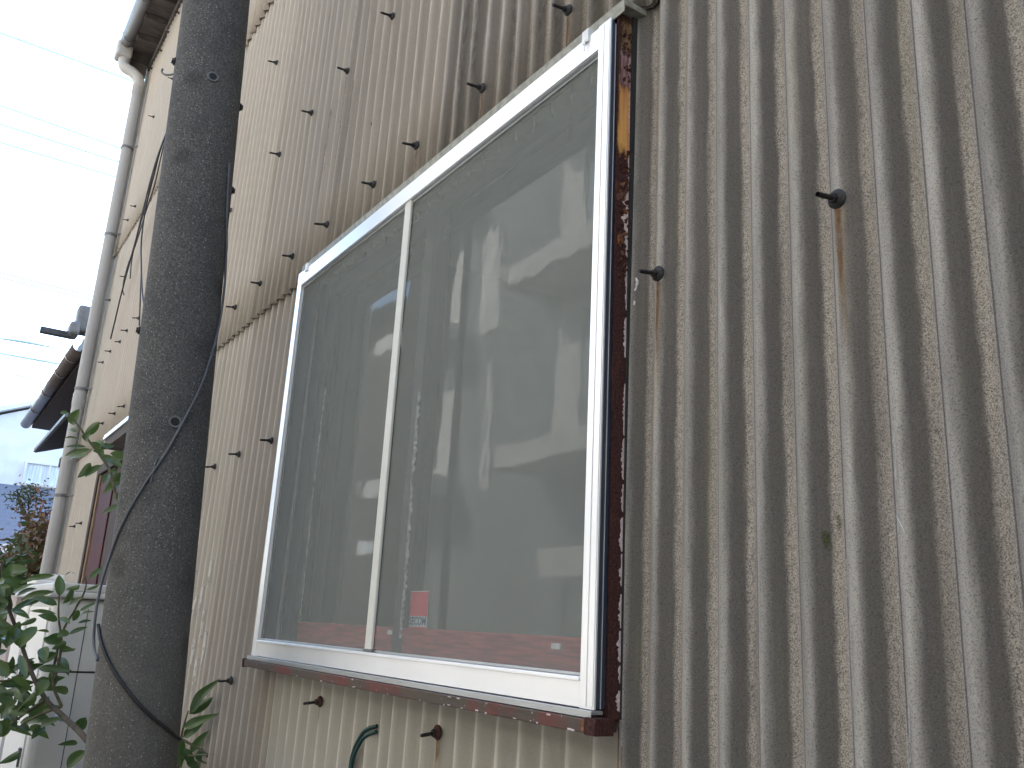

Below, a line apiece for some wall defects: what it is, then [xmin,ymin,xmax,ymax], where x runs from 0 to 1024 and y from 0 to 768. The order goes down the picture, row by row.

peeling [621,156,629,357]
corrosion [616,19,635,278]
corrosion [835,208,843,291]
peeling [615,385,625,712]